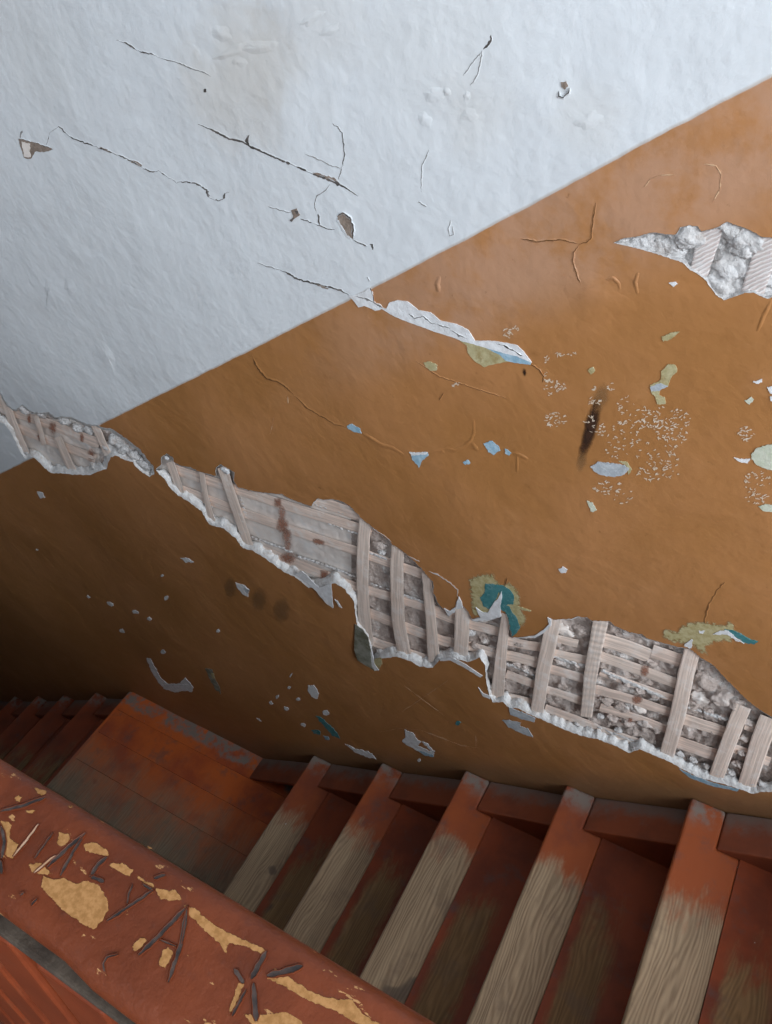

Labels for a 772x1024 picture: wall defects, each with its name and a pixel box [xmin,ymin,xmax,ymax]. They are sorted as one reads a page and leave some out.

crack [117,40,211,77]
crack [46,126,229,201]
crack [198,123,374,250]
crack [521,203,596,284]
flaking render [614,222,772,300]
flaking render [349,287,545,382]
peeling [650,364,677,405]
damp [580,405,599,453]
flaking render [0,393,772,794]